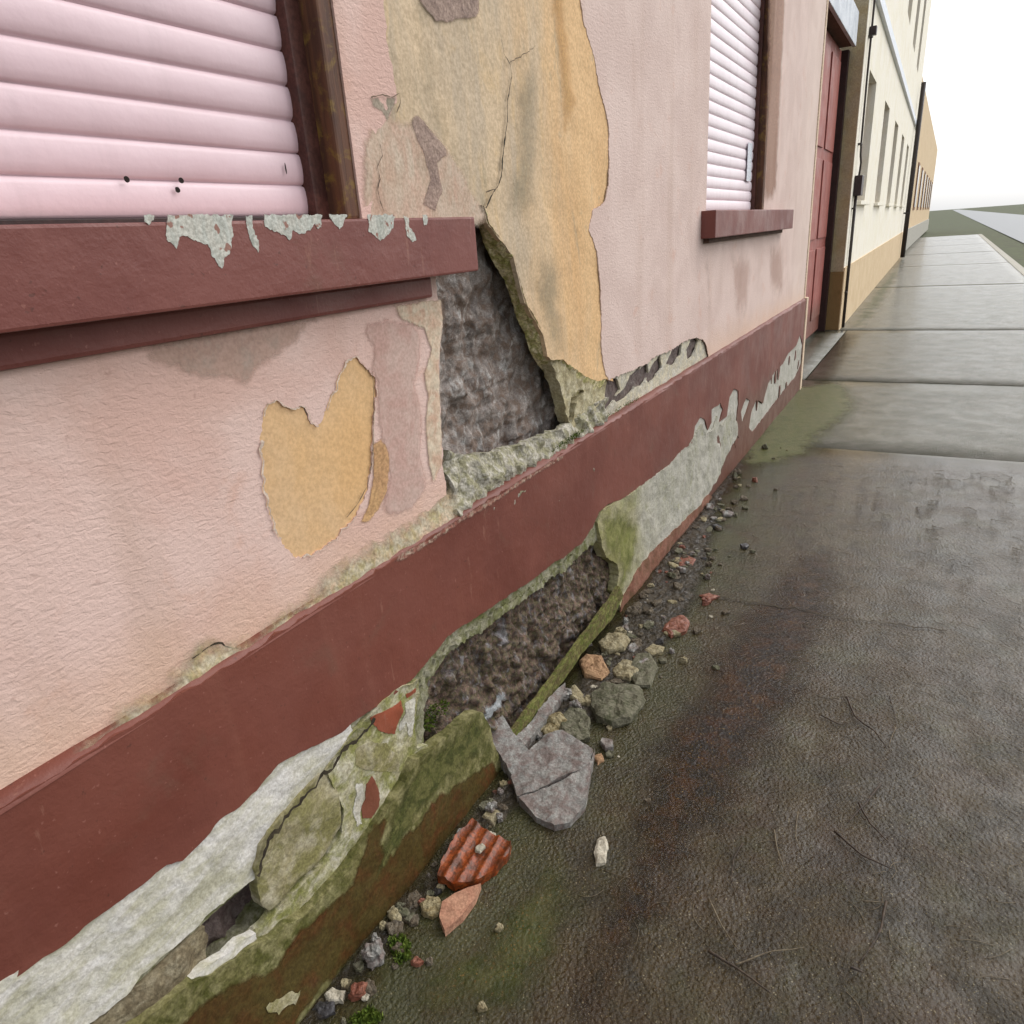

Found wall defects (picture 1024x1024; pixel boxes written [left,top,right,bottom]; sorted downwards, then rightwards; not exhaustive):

crack [486,34,534,208]
peeling [144,213,347,268]
peeling [259,0,708,632]
leakage [745,384,852,463]
flaking render [0,337,802,1024]
crack [257,717,376,877]